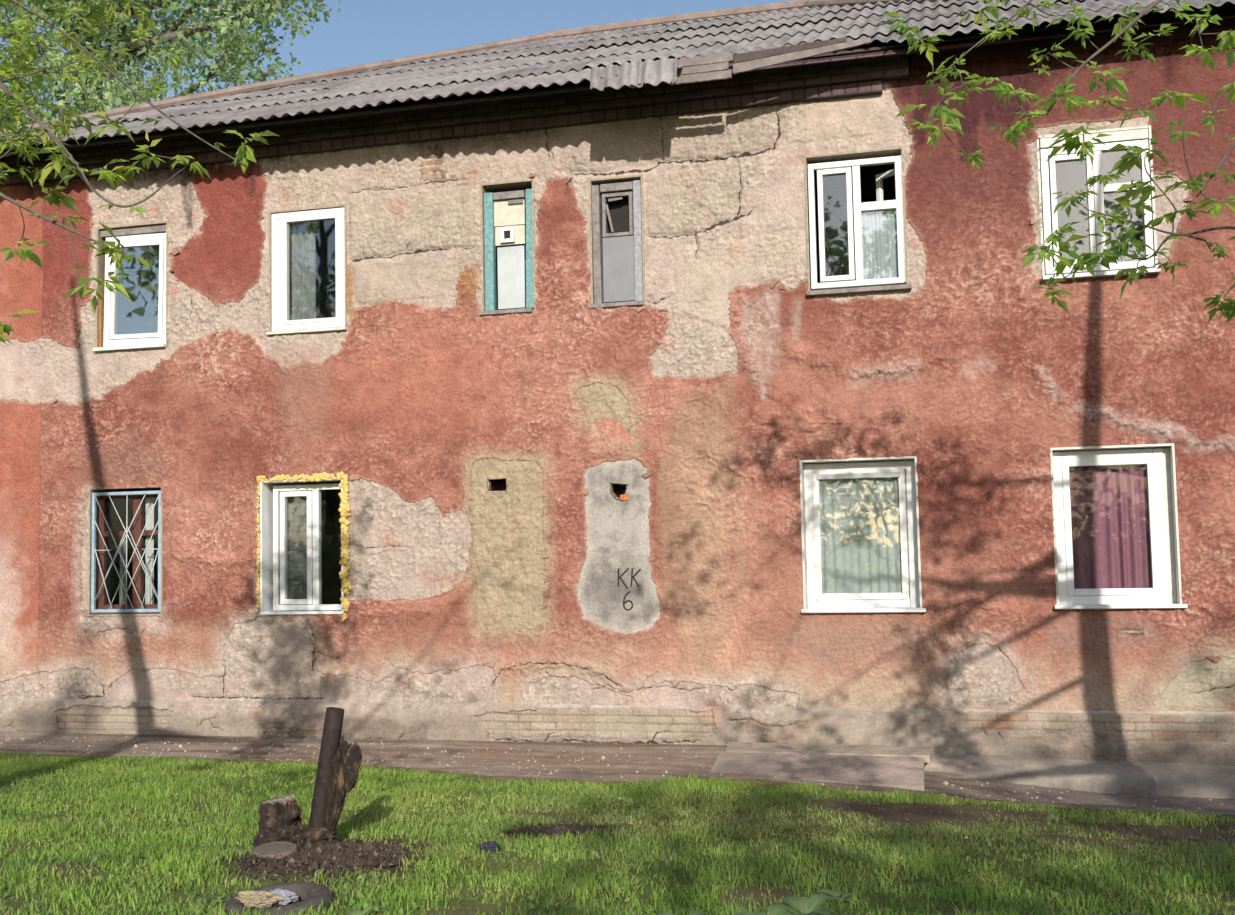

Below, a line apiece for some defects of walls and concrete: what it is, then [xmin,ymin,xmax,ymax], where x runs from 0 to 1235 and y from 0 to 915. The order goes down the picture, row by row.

leakage [898,46,1071,158]
spalling [0,82,927,406]
crack [545,111,781,257]
spalling [0,474,799,744]
flaking render [946,642,1235,747]